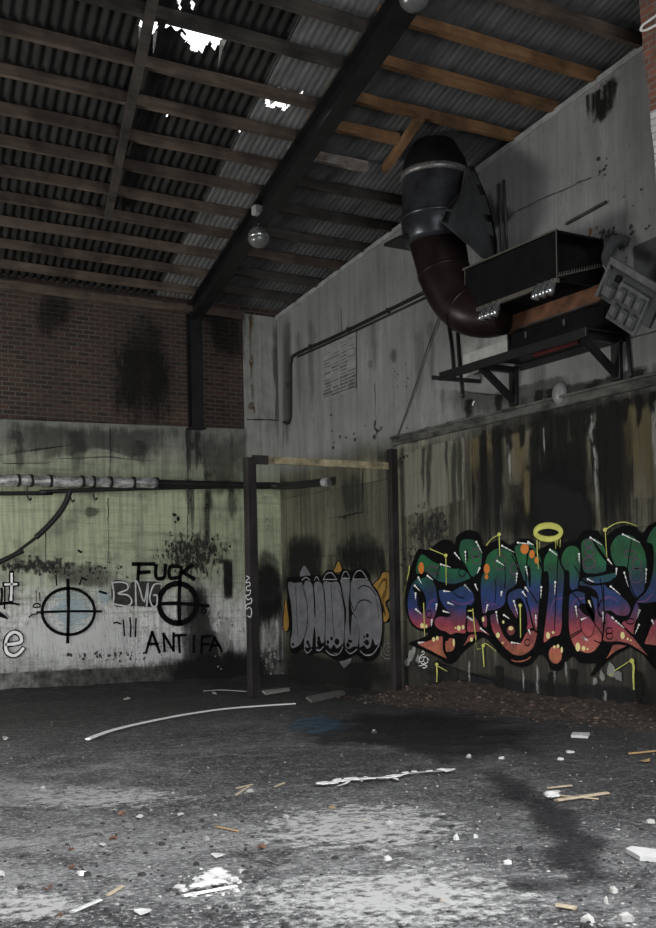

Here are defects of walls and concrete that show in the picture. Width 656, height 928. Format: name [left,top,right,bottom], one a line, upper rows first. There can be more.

damp [586,78,616,123]
damp [185,430,200,469]
corrosion [515,431,530,512]
corrosion [624,404,652,487]
damp [188,489,210,542]